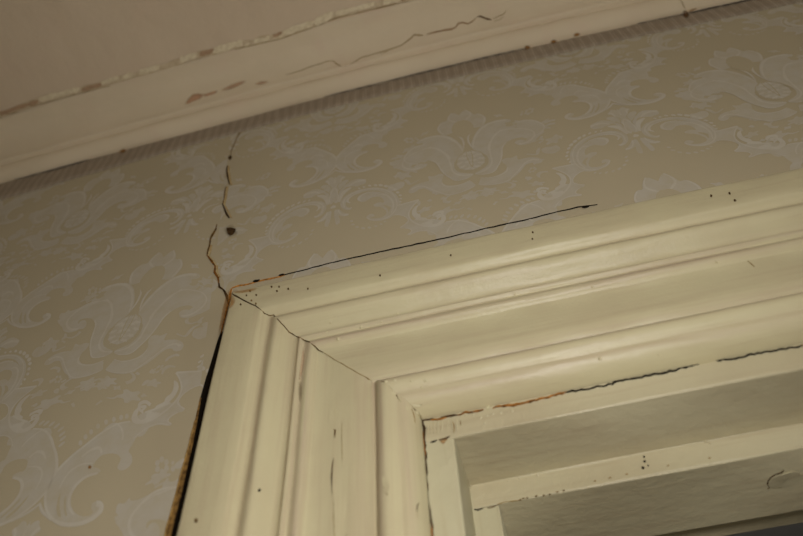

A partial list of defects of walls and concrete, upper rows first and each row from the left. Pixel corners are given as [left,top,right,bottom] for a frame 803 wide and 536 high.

peeling [0,0,410,118]
crack [287,11,506,75]
crack [207,132,372,381]
crack [279,204,597,276]
crack [422,345,803,536]